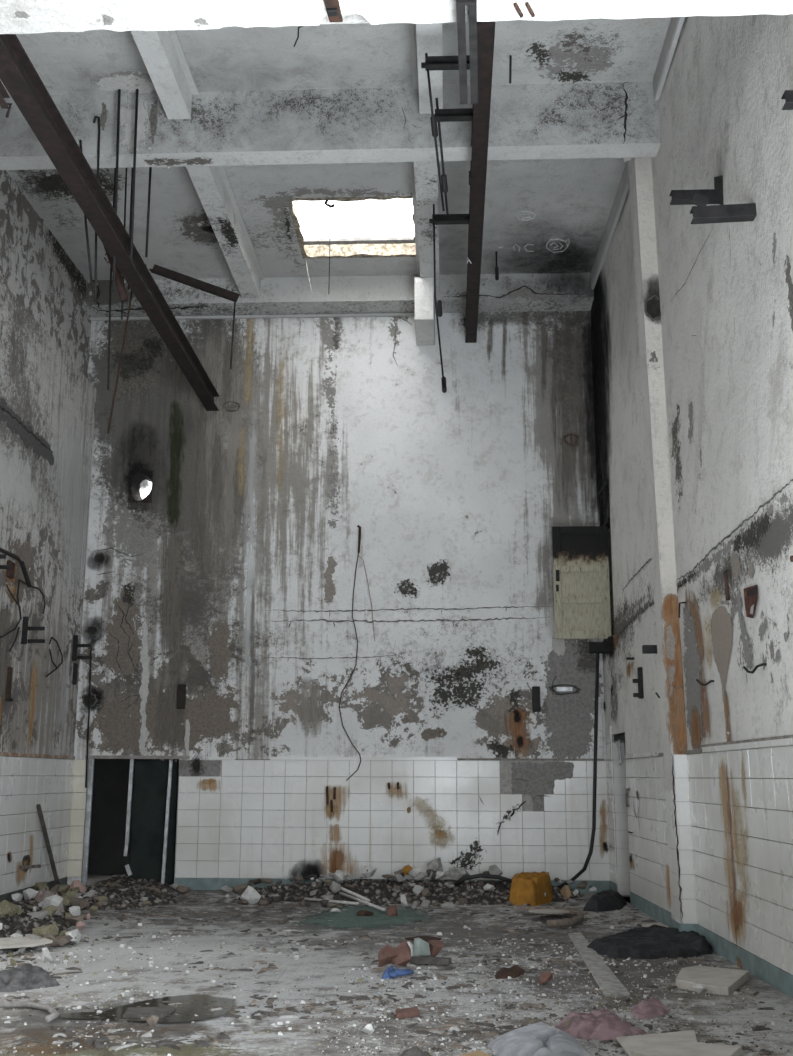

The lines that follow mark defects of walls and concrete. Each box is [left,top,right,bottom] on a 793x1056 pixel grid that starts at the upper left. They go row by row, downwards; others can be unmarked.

peeling [772,233,793,331]
water stain [333,317,343,349]
water stain [461,311,597,505]
flaking render [270,680,329,734]
flaking render [343,670,574,812]
spalling [545,681,581,695]
corrosion [662,594,687,755]
corrosion [326,787,353,874]
corrosion [719,763,744,940]